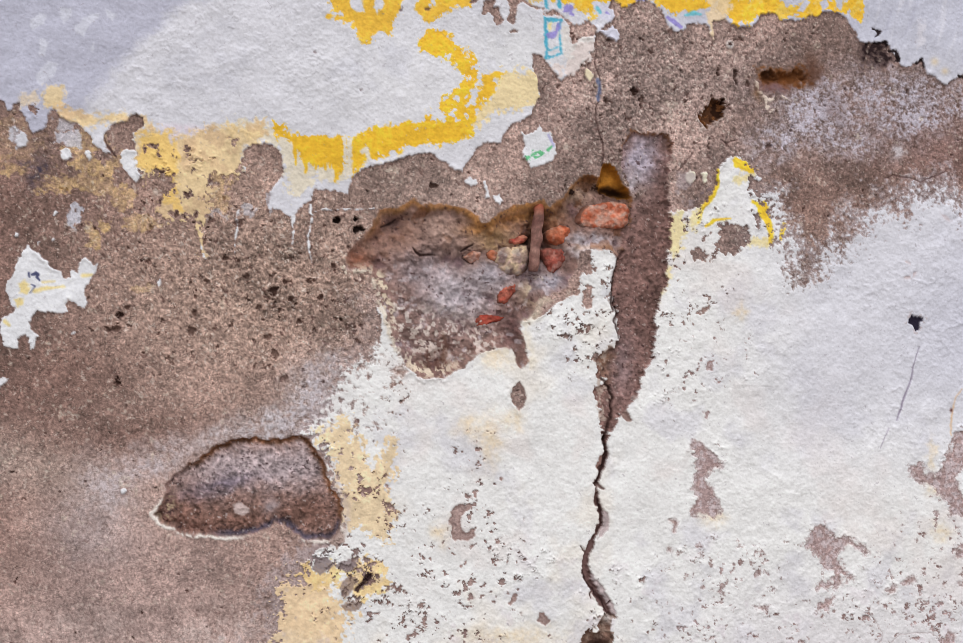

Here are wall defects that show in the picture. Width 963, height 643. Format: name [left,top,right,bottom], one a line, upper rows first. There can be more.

crack [594,32,606,167]
peeling [677,12,963,263]
peeling [0,0,682,643]
peeling [780,242,792,275]
peeling [791,269,824,290]
peeling [690,439,725,520]
peeling [908,431,963,518]
crack [581,433,617,618]
peeling [804,525,869,611]
peeling [888,577,955,643]